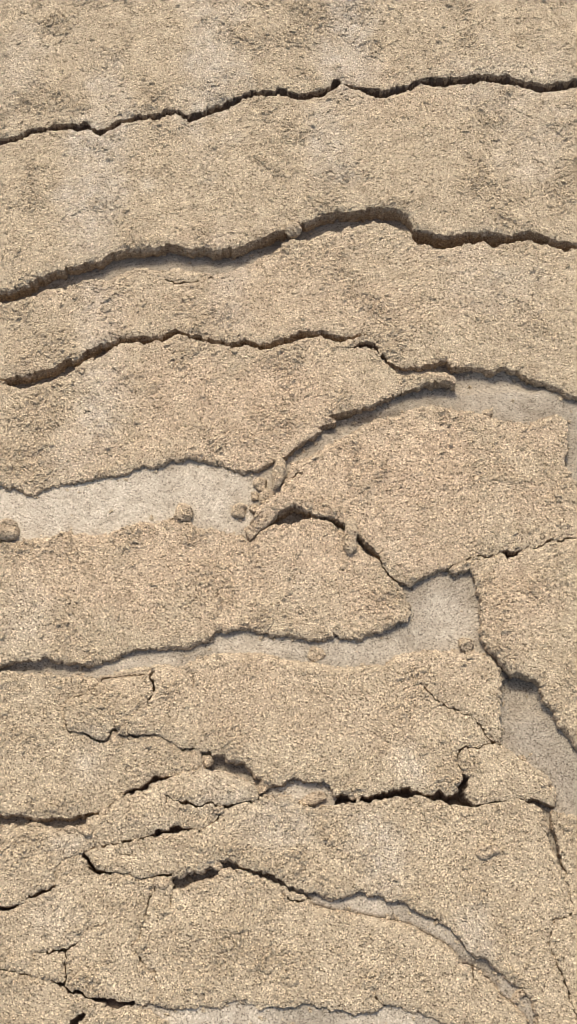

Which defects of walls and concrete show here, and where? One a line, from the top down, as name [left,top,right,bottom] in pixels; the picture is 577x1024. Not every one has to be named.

crack [0,75,577,146]
crack [3,218,462,304]
crack [0,344,577,543]
crack [0,525,577,1024]